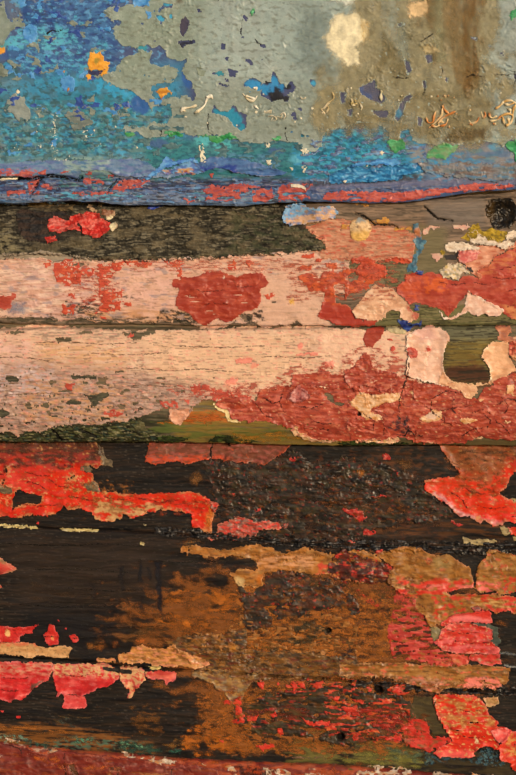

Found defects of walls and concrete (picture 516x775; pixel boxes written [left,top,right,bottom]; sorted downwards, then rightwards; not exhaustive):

peeling [0,0,516,541]
crack [255,389,334,431]
crack [363,362,423,437]
crack [430,390,516,436]